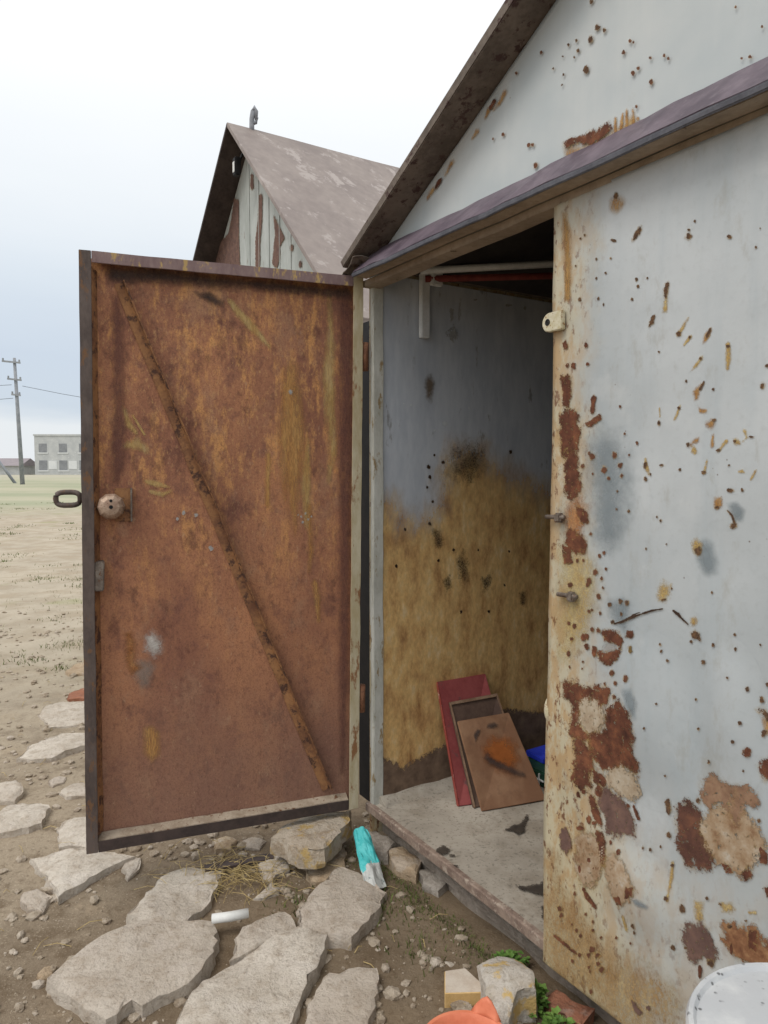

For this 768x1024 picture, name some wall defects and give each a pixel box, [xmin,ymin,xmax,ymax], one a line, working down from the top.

rust [562,24,606,74]
rust [563,105,639,156]
rust [685,380,753,452]
rust [324,296,352,740]
rust [383,362,638,771]
leakage [503,708,546,752]
leakage [383,744,452,795]
peeling [561,678,642,910]
peeling [664,772,768,882]
peeling [759,758,768,781]
rust [544,830,677,1024]
peeling [670,904,720,979]